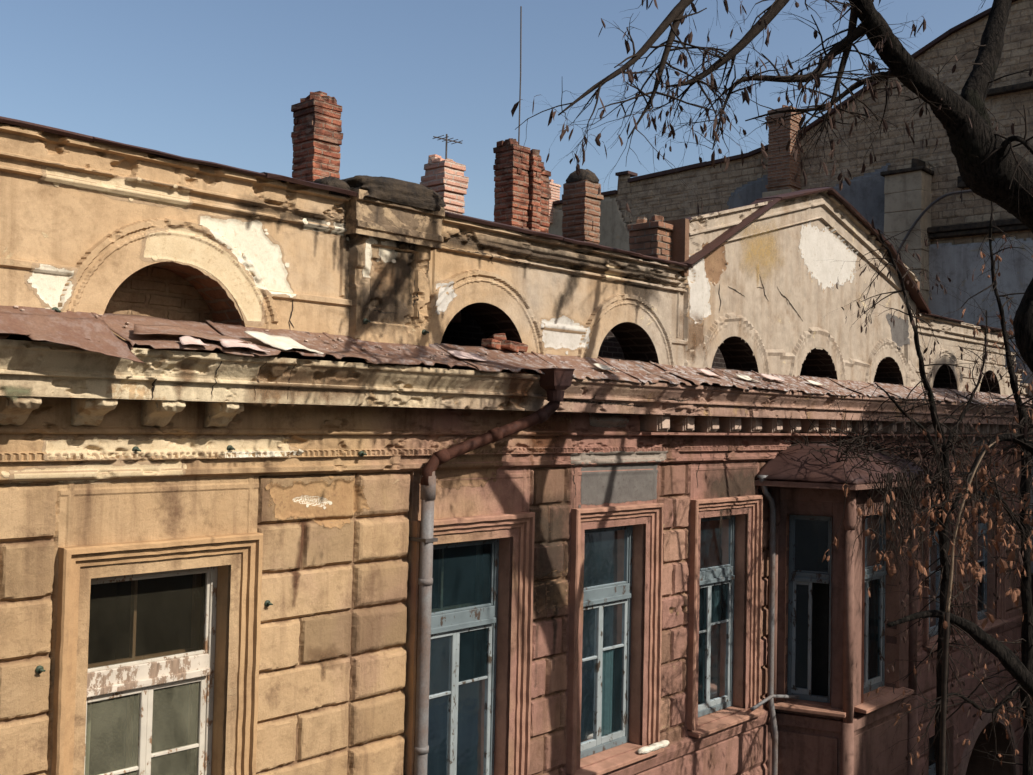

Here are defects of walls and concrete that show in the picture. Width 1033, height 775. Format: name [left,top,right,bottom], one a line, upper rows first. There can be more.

peeling [39,162,298,327]
peeling [798,222,858,293]
peeling [24,260,78,312]
peeling [540,314,591,355]
peeling [1,434,304,487]
spalling [265,474,370,529]